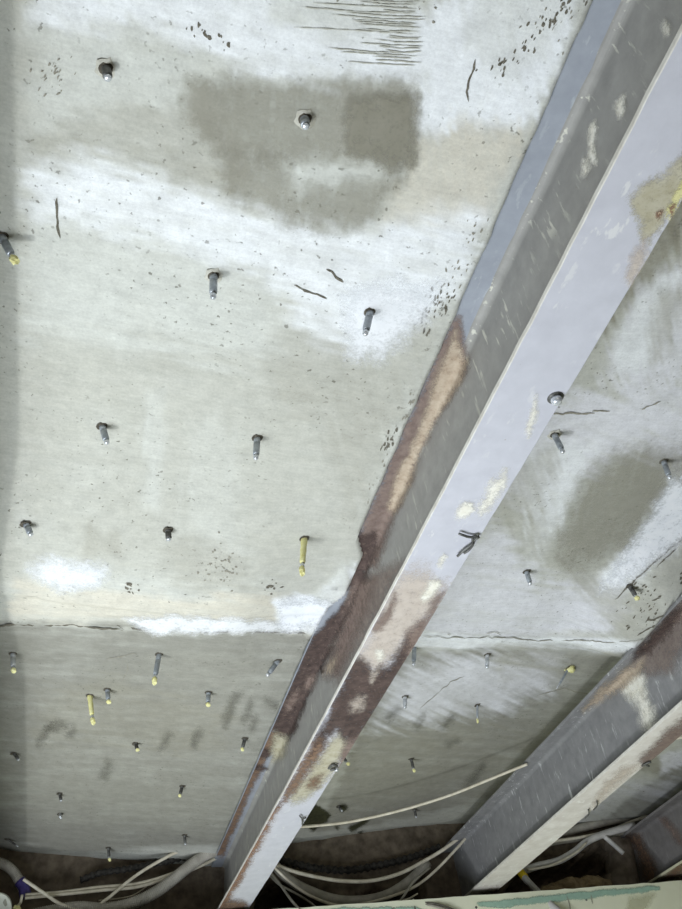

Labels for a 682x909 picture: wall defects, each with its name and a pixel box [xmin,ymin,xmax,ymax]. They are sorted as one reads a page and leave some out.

rust [217,316,467,909]